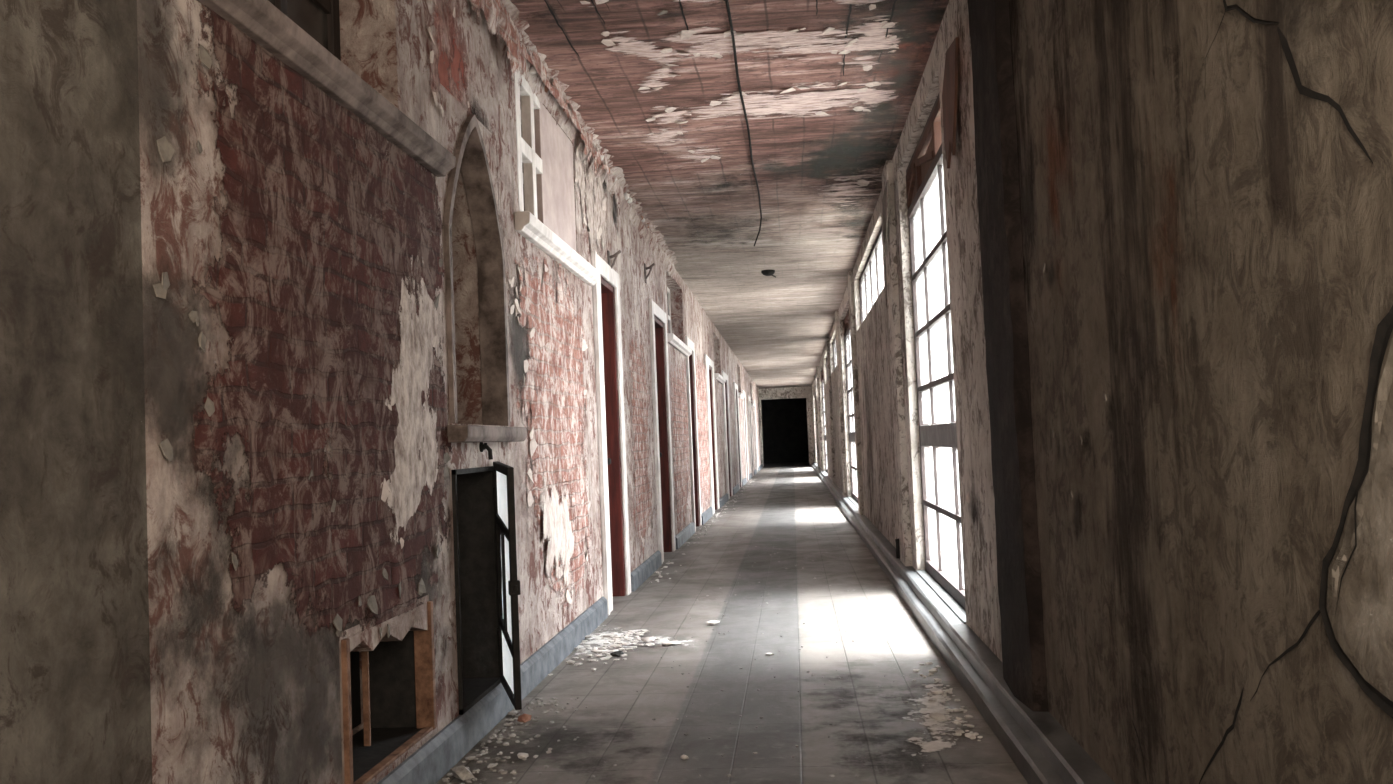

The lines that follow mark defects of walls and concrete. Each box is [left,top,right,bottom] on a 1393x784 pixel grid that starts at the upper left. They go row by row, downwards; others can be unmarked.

flaking render [98,0,452,641]
flaking render [508,244,591,615]
peeling [601,0,902,167]
crack [1199,305,1393,784]